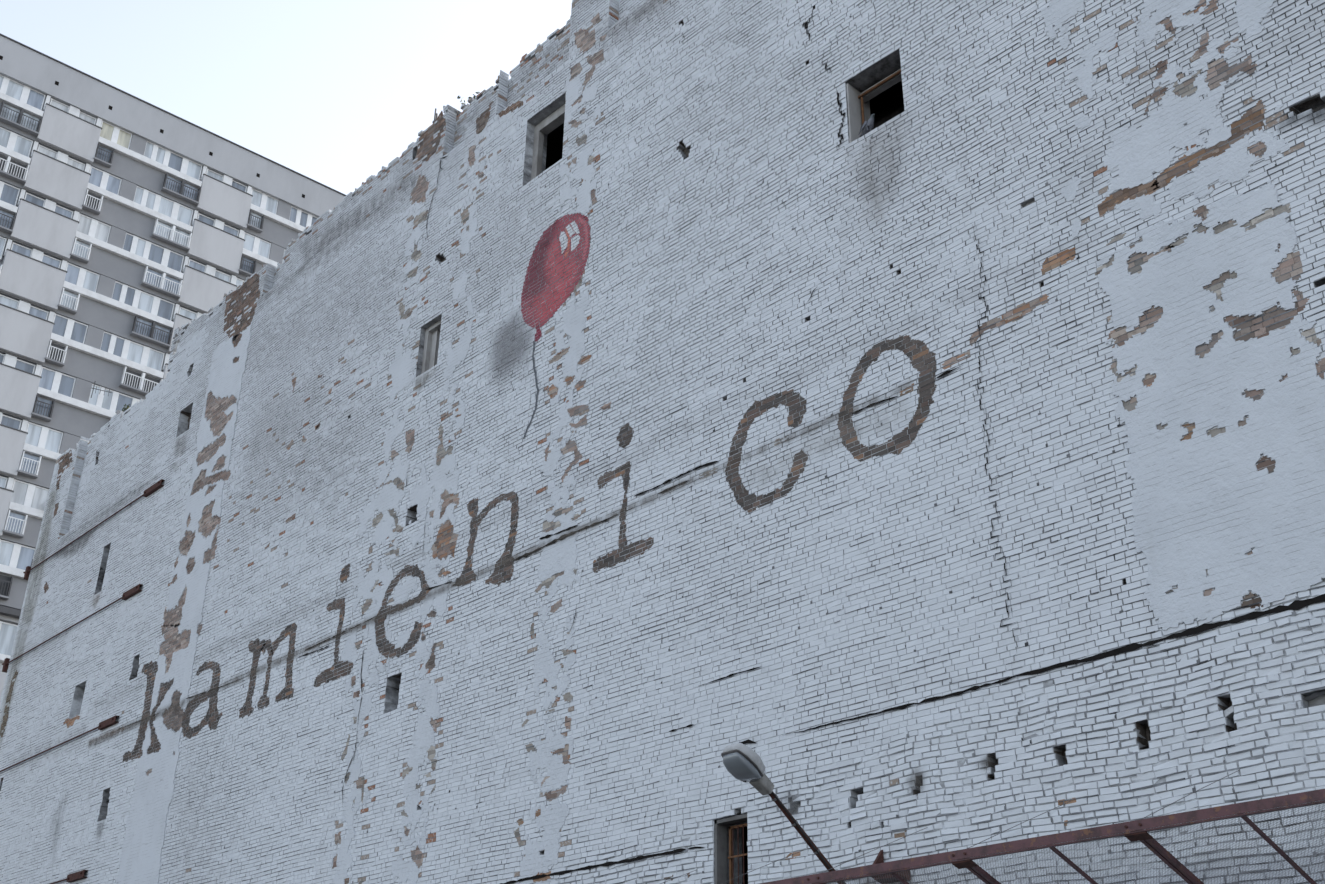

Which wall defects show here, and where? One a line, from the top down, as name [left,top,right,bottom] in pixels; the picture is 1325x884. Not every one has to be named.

crack [803,9,845,153]
flaking render [1097,99,1267,217]
flaking render [1144,31,1257,115]
spalling [1289,96,1325,116]
flaking render [1095,203,1291,276]
flaking render [223,274,260,363]
flaking render [1107,306,1163,411]
flaking render [1196,244,1325,380]
crack [971,226,1018,660]
flaking render [159,392,237,673]
flaking render [361,490,460,614]
crack [500,855,659,884]